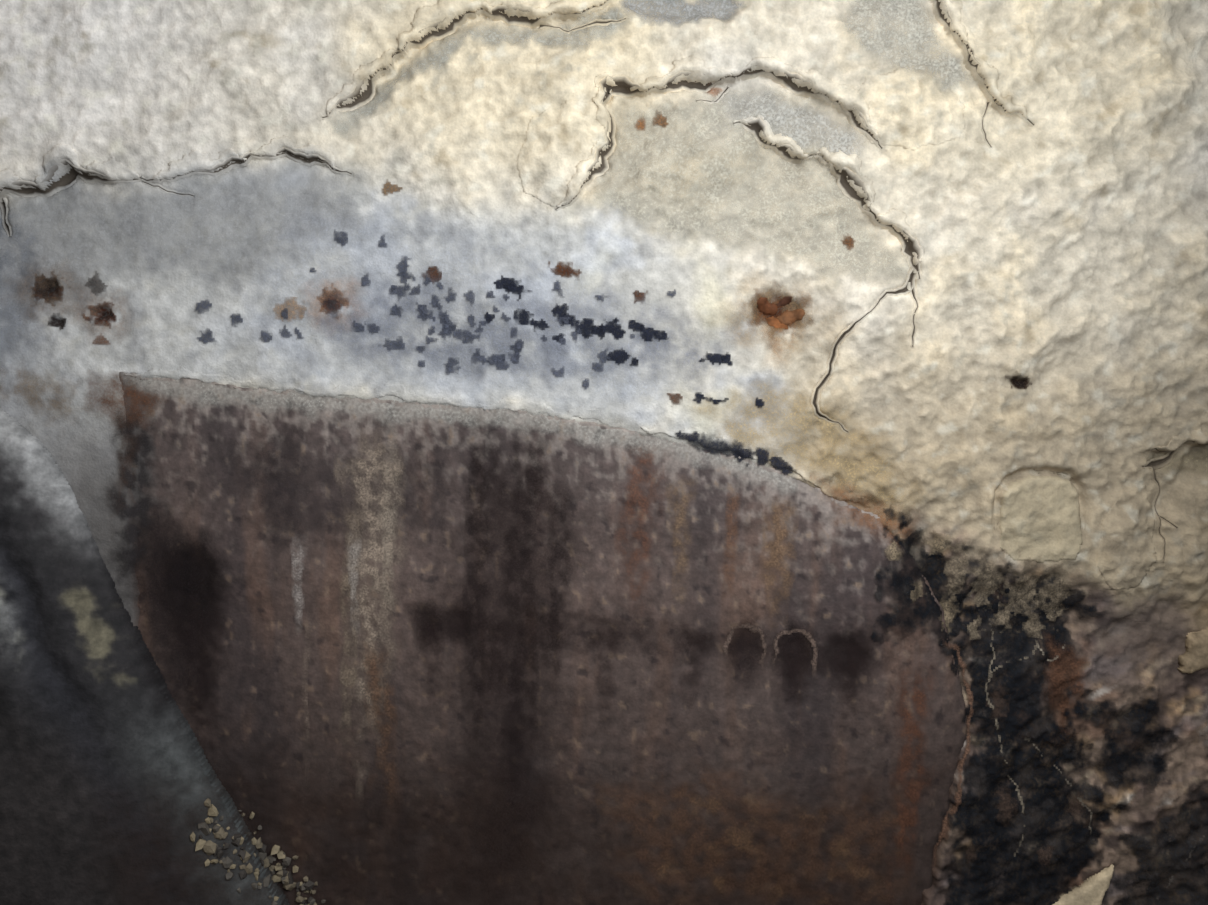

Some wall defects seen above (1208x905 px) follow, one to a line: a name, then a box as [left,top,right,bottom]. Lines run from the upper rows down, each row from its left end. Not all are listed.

crack [322,0,626,120]
spalling [326,0,741,131]
rust [33,271,64,306]
rust [82,302,116,345]
spalling [0,135,344,293]
crack [0,147,352,237]
mould [351,256,667,390]
mould [686,352,733,366]
mould [693,392,729,404]
crack [555,64,922,434]
spalling [557,55,925,276]
rust [750,291,812,334]